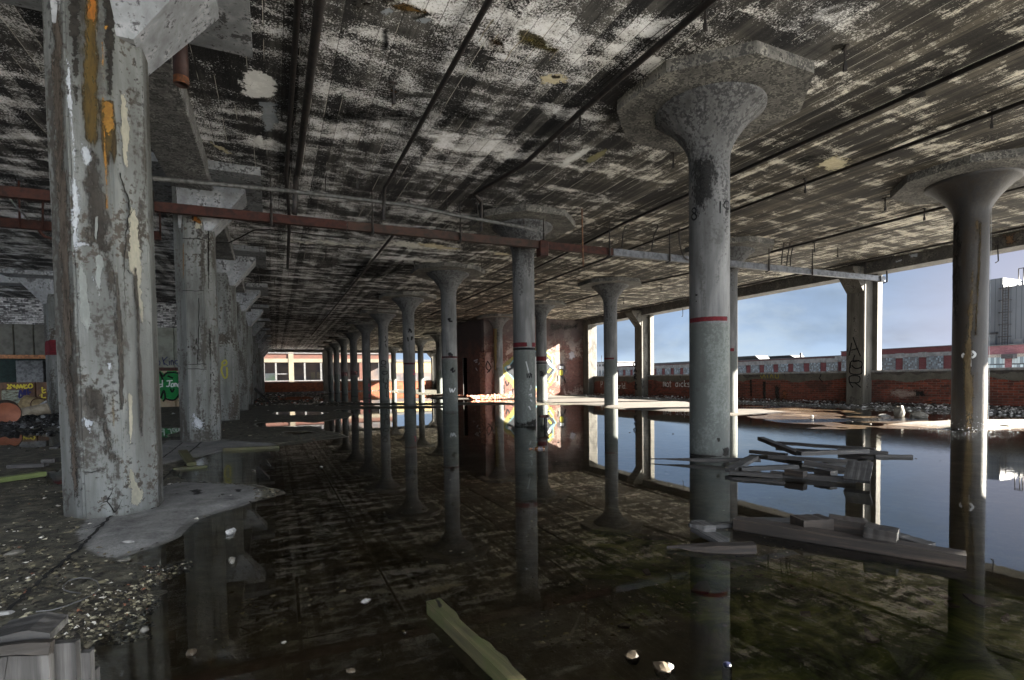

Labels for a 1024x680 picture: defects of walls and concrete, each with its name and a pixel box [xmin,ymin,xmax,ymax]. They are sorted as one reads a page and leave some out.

leakage [353,0,435,24]
leakage [478,19,561,62]
peeling [120,94,130,168]
peeling [237,67,279,146]
leakage [558,146,609,166]
peeling [77,151,115,333]
peeling [128,207,143,443]
leakage [82,274,125,463]
peeling [128,469,144,506]